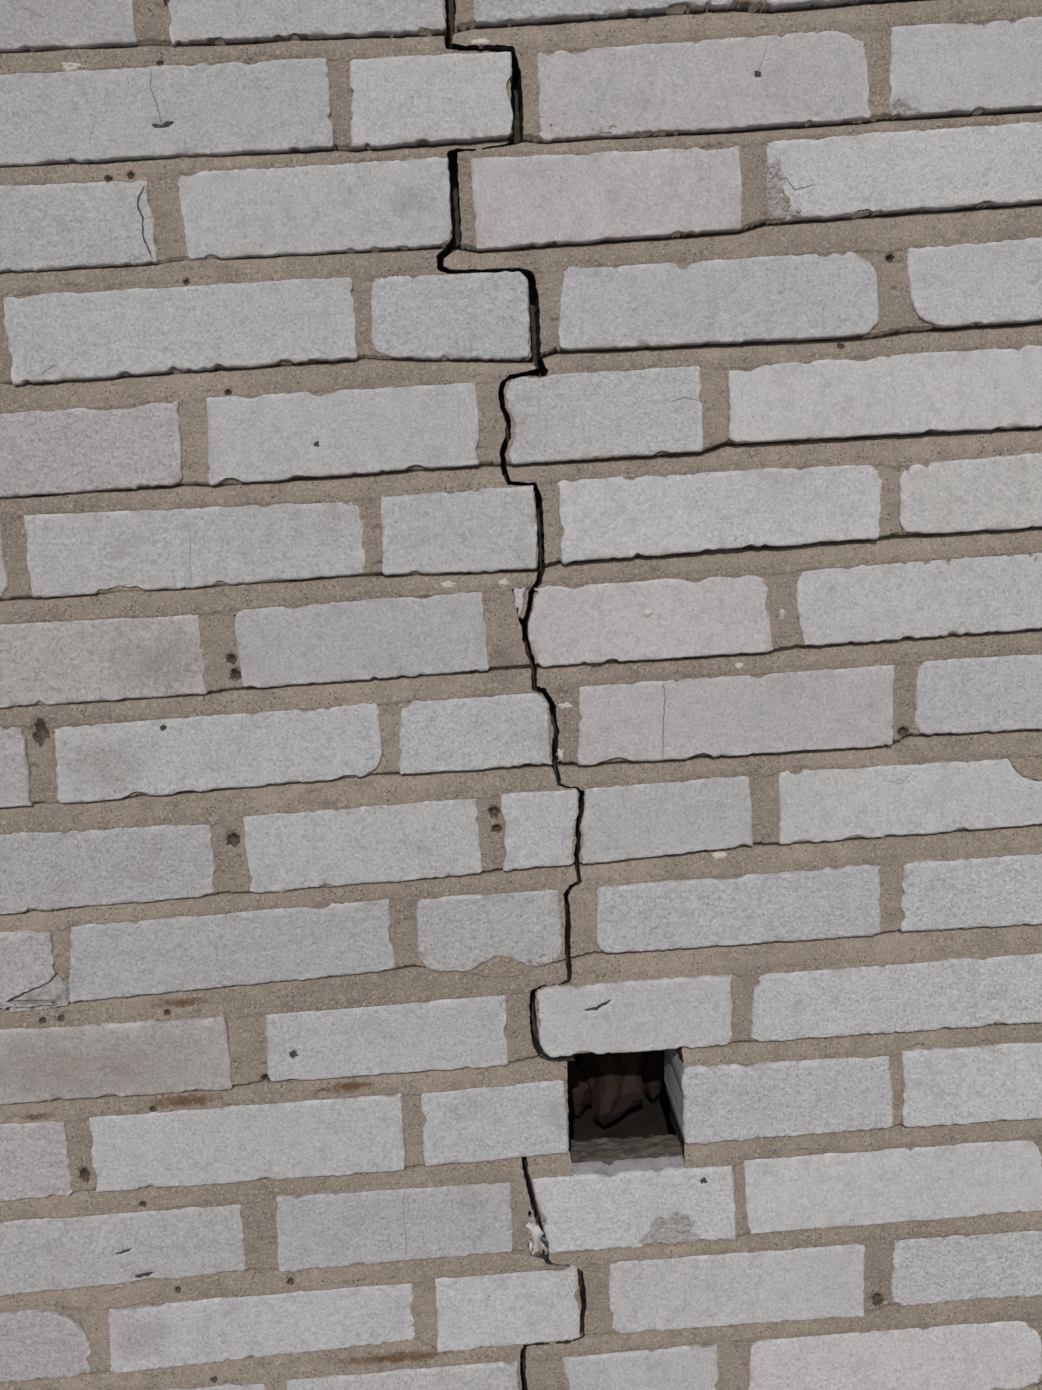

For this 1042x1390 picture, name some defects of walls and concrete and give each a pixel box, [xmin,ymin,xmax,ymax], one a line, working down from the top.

crack [437,0,584,1063]
spalling [567,1047,685,1166]
crack [520,1157,586,1390]